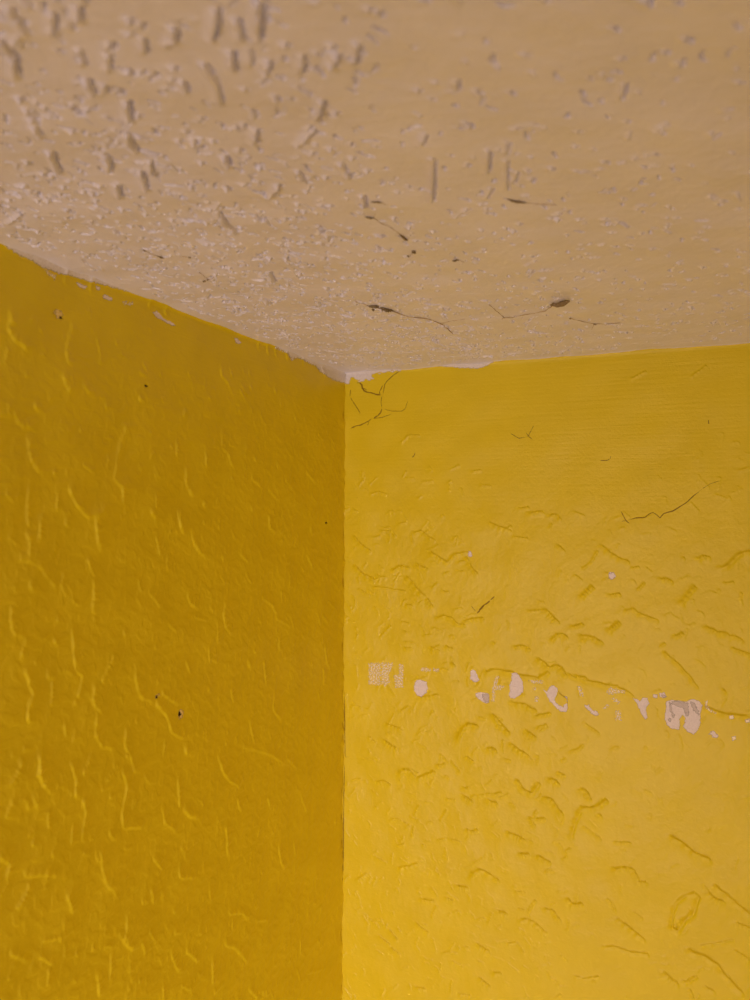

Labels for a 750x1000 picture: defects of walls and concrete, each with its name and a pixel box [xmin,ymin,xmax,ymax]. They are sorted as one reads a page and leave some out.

crack [350,371,407,428]
crack [621,481,718,523]
peeling [414,680,428,697]
peeling [470,670,489,703]
peeling [509,673,523,699]
peeling [544,686,568,712]
peeling [634,692,703,734]